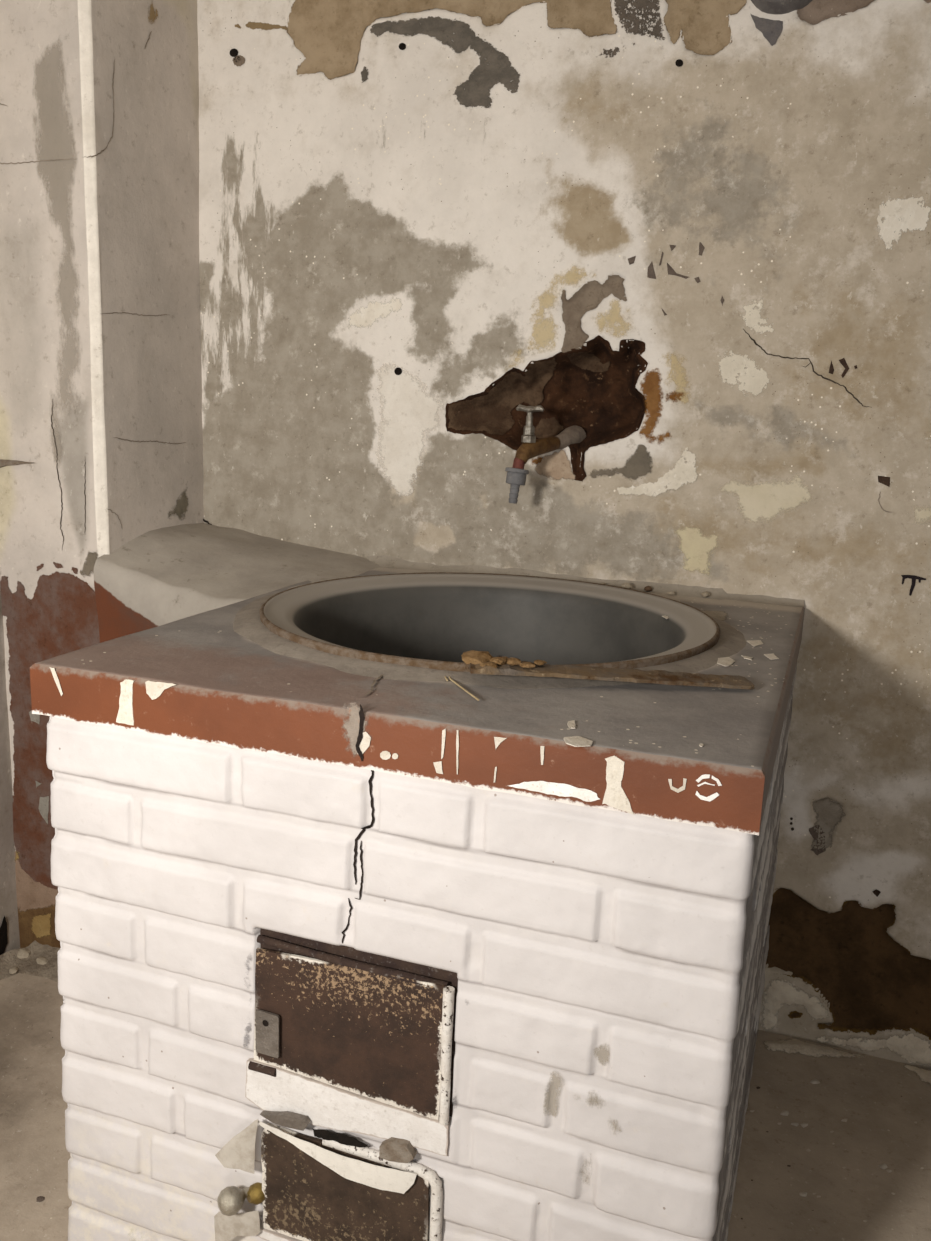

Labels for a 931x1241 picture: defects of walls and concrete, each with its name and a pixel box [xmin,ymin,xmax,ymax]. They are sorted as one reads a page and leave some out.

peeling [286,0,618,80]
peeling [663,0,747,55]
water stain [35,45,79,460]
peeling [628,245,701,283]
spalling [445,275,648,481]
crack [743,329,872,408]
crack [342,675,383,943]
spalling [809,798,846,855]
water stain [762,979,931,1084]